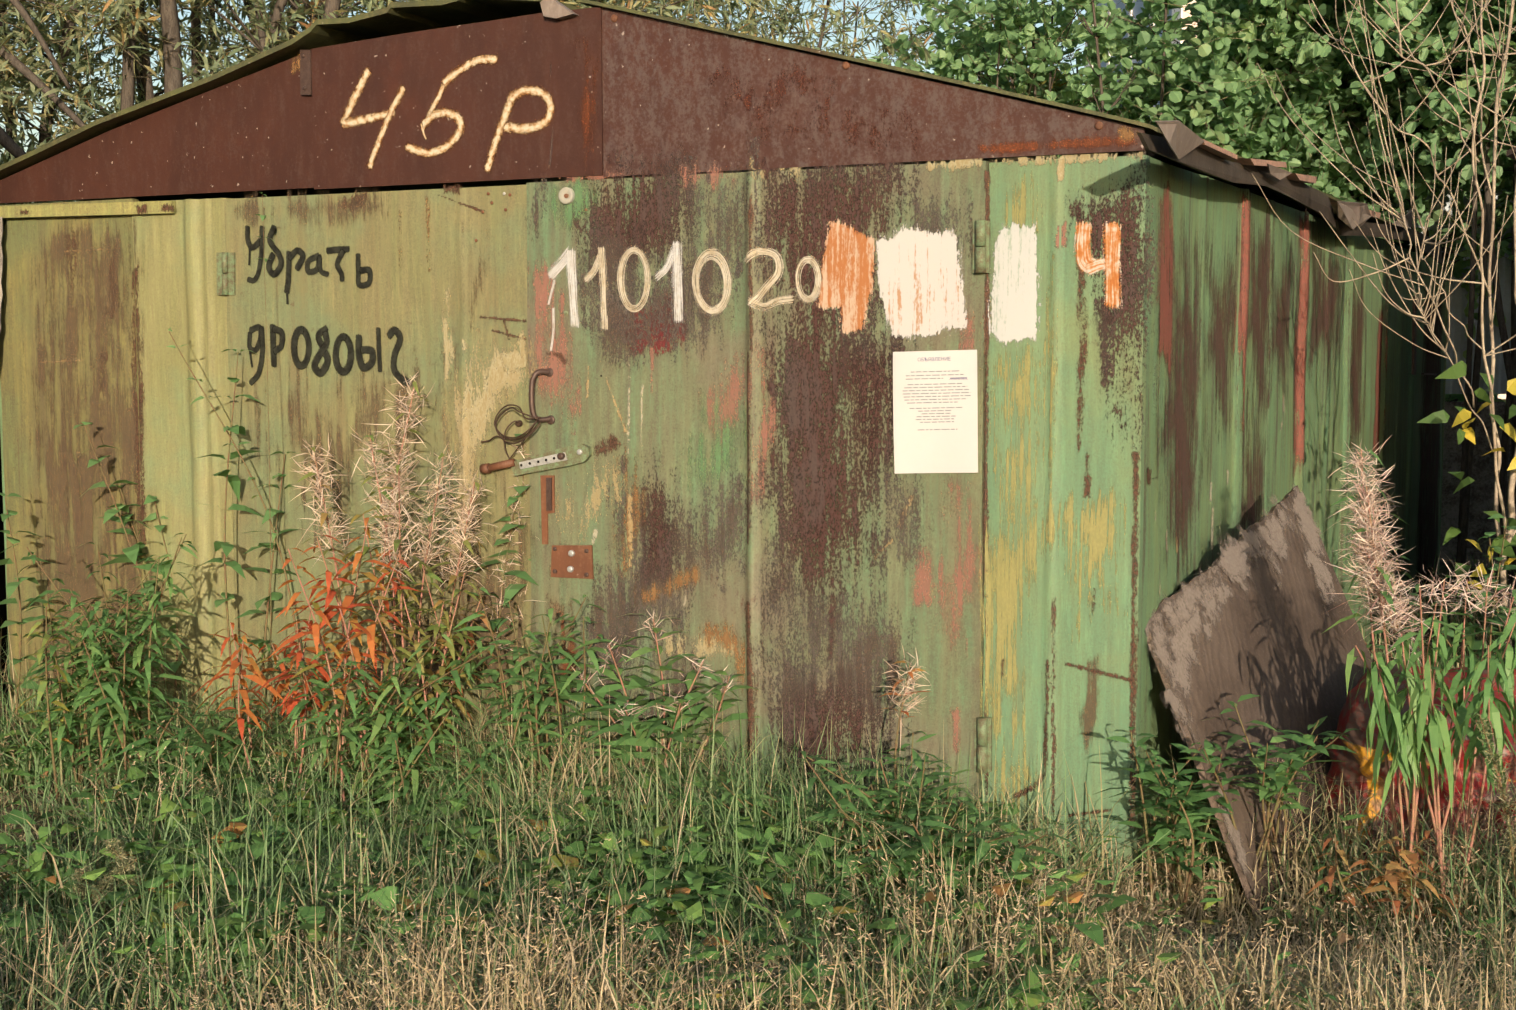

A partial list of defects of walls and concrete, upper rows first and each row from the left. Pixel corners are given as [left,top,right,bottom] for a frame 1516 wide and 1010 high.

rust [131,264,146,545]
rust [594,435,700,604]
rust [620,293,688,392]
rust [745,602,759,773]
peeling [441,65,1143,831]
rust [979,126,1367,829]
peeling [1150,508,1288,663]
peeling [1232,191,1251,431]
rust [1415,288,1442,593]